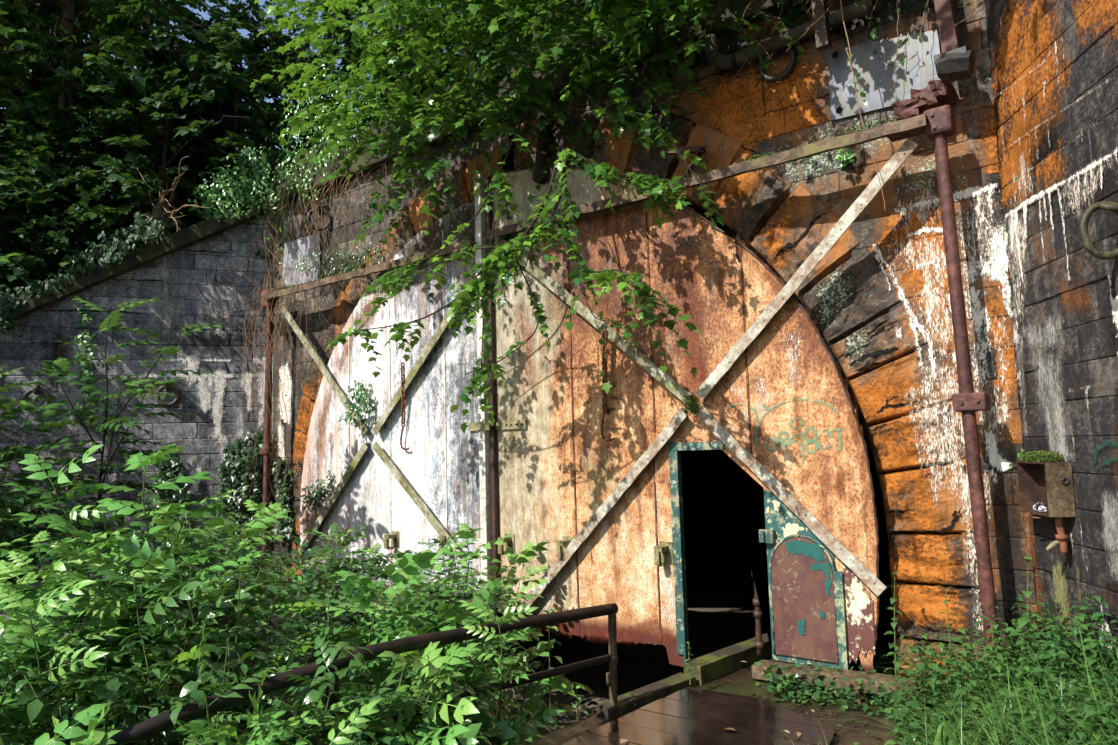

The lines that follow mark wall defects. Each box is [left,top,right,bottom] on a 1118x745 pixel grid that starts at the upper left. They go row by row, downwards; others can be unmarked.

damp [830,0,941,43]
damp [139,355,266,495]
damp [278,363,294,461]
corrosion [305,388,335,530]
corrosion [334,276,404,376]
corrosion [681,270,706,399]
corrosion [715,239,841,393]
corrosion [846,410,871,530]
damp [872,182,983,630]
damp [953,40,1118,643]
peeling [766,500,831,596]
peeling [796,620,805,635]